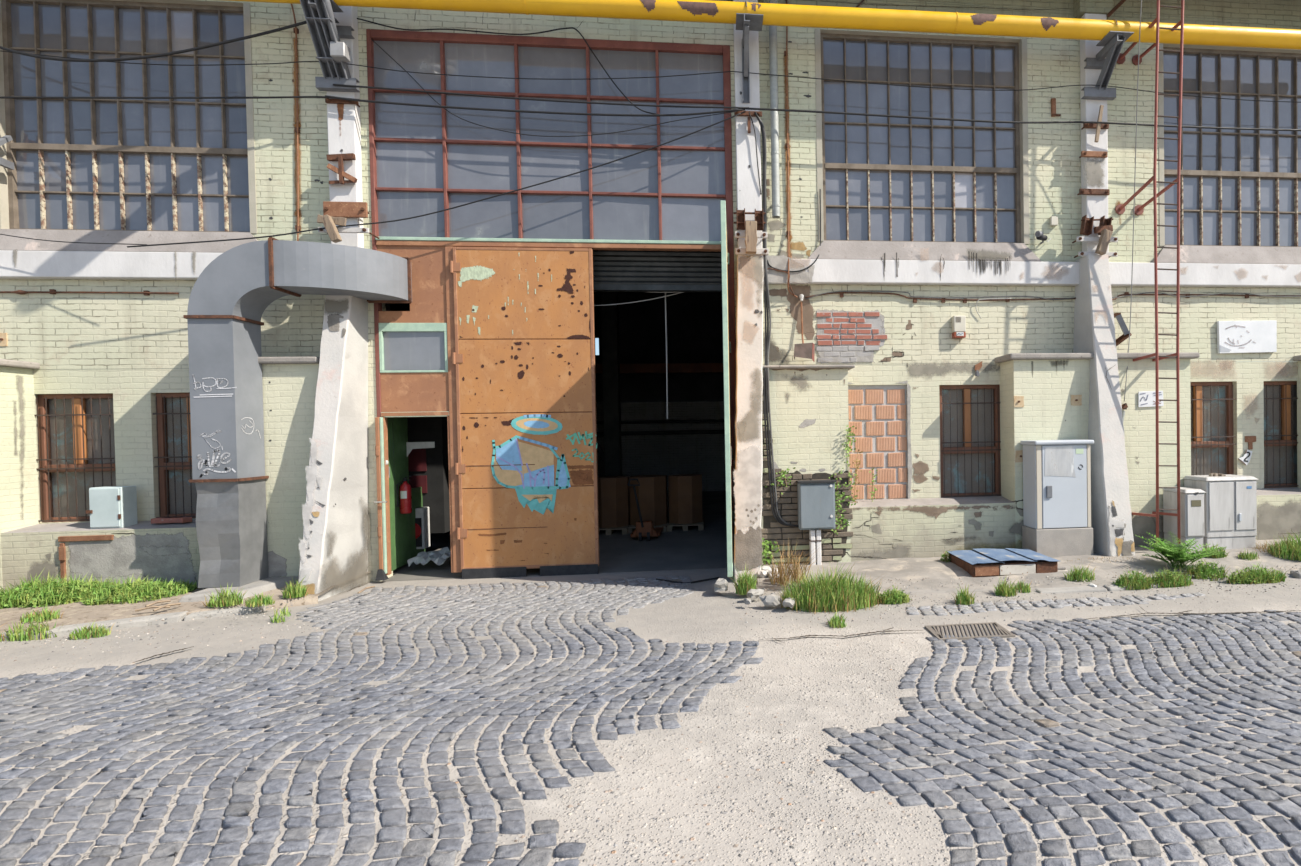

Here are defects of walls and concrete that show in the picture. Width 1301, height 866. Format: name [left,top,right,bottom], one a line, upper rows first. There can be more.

peeling [641,0,656,12]
peeling [677,1,718,17]
peeling [971,14,997,25]
peeling [1041,17,1059,31]
corrosion [784,56,792,257]
peeling [754,220,815,340]
damp [968,250,1011,275]
corrosion [539,251,591,377]
corrosion [462,342,534,395]
flaking render [733,346,1013,570]